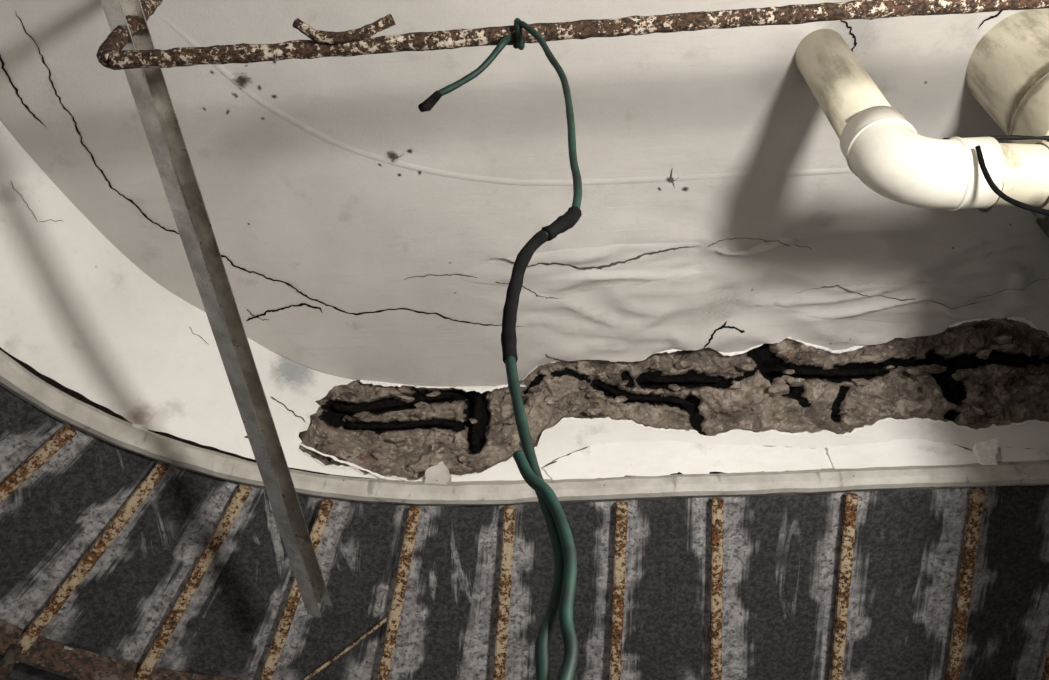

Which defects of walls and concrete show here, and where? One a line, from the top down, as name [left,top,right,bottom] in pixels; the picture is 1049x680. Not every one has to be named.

crack [978,11,1002,29]
crack [0,13,179,234]
crack [221,255,524,327]
crack [407,274,559,299]
crack [704,321,745,348]
spalling [298,316,1049,484]